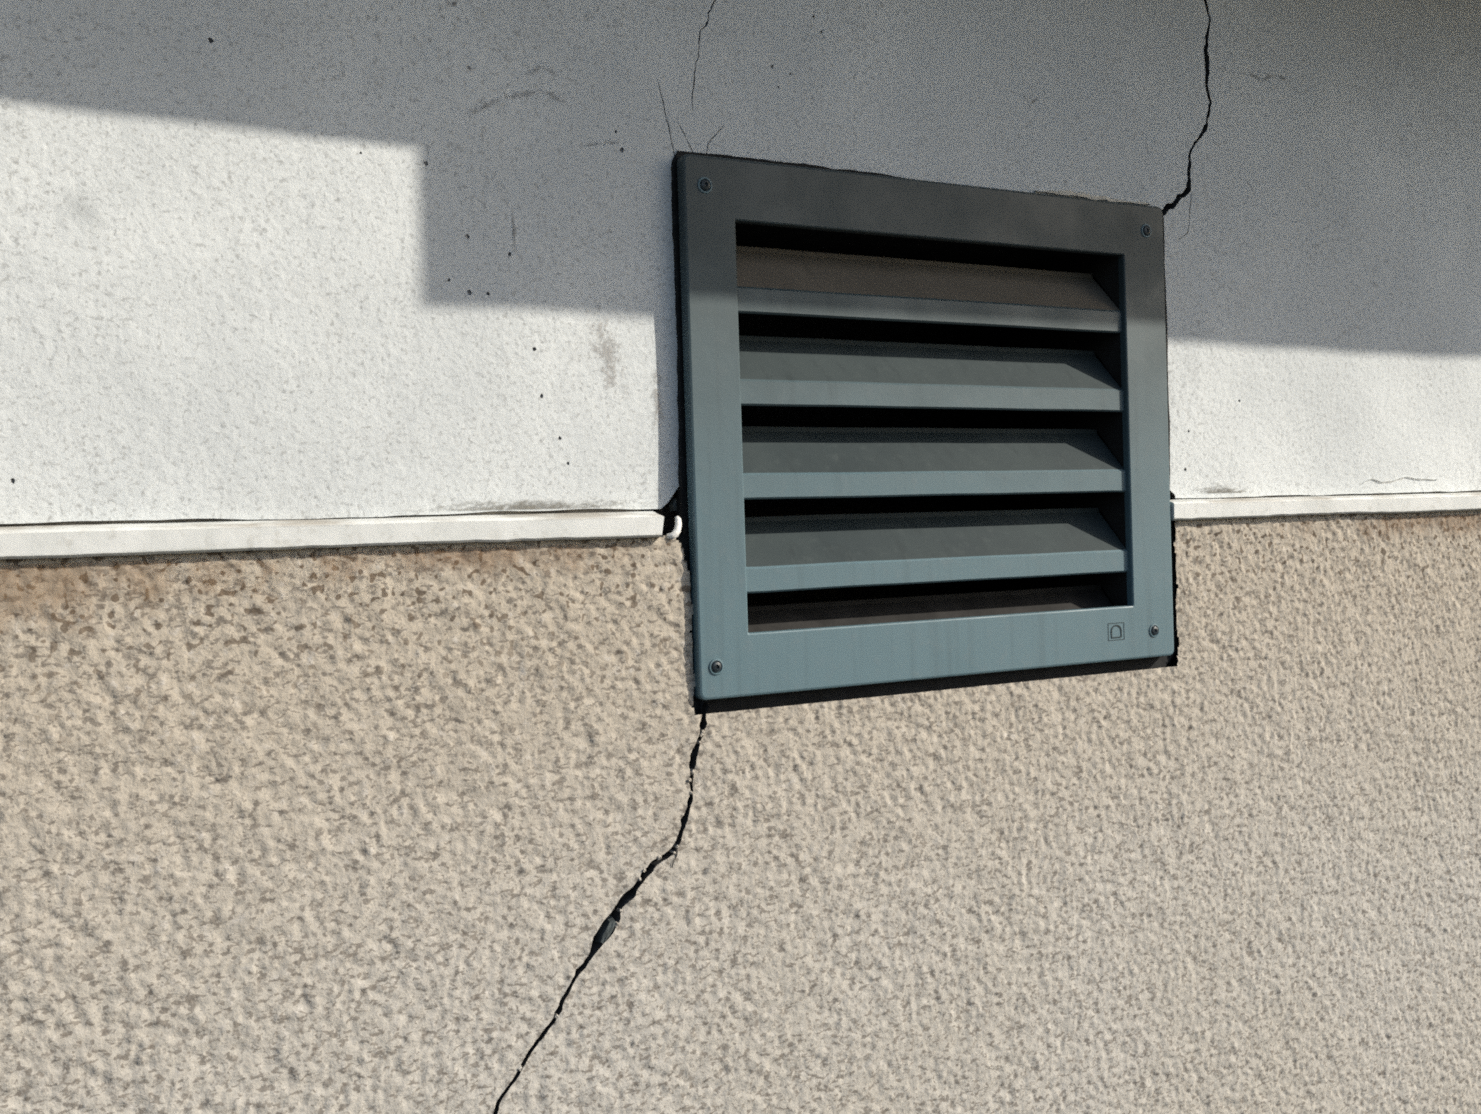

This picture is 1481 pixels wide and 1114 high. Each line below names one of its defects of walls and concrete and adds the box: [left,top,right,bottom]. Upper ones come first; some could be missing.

crack [1162,0,1212,239]
crack [493,700,709,1114]